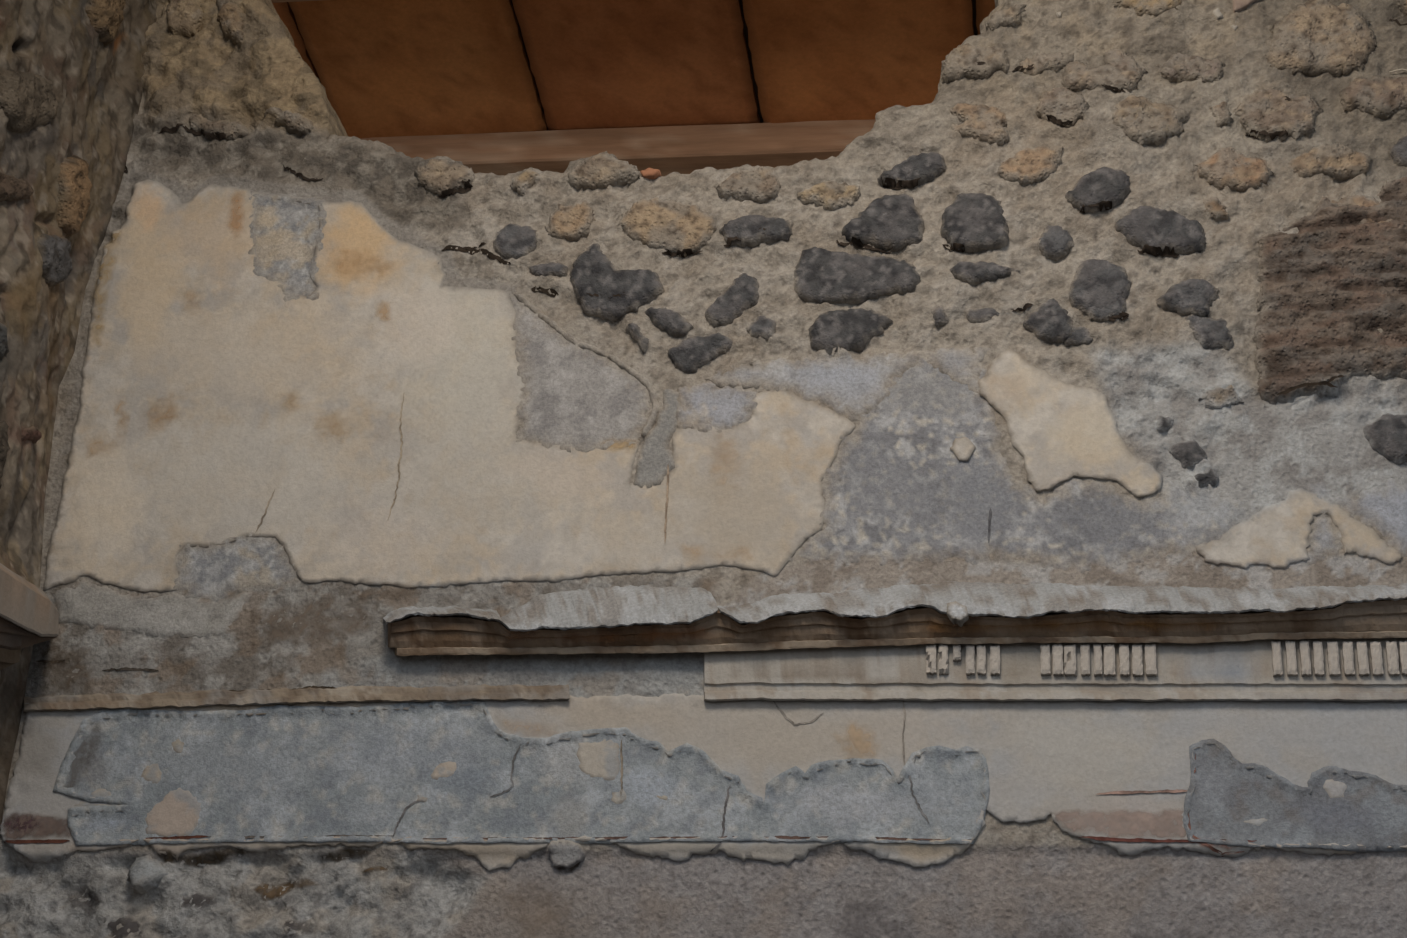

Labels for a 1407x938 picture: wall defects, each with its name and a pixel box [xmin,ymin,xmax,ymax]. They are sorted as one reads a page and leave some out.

peeling [248,189,327,302]
crack [388,394,404,519]
peeling [1183,739,1407,853]
spalling [107,918,141,938]
spalling [182,894,212,907]
spalling [255,880,314,899]